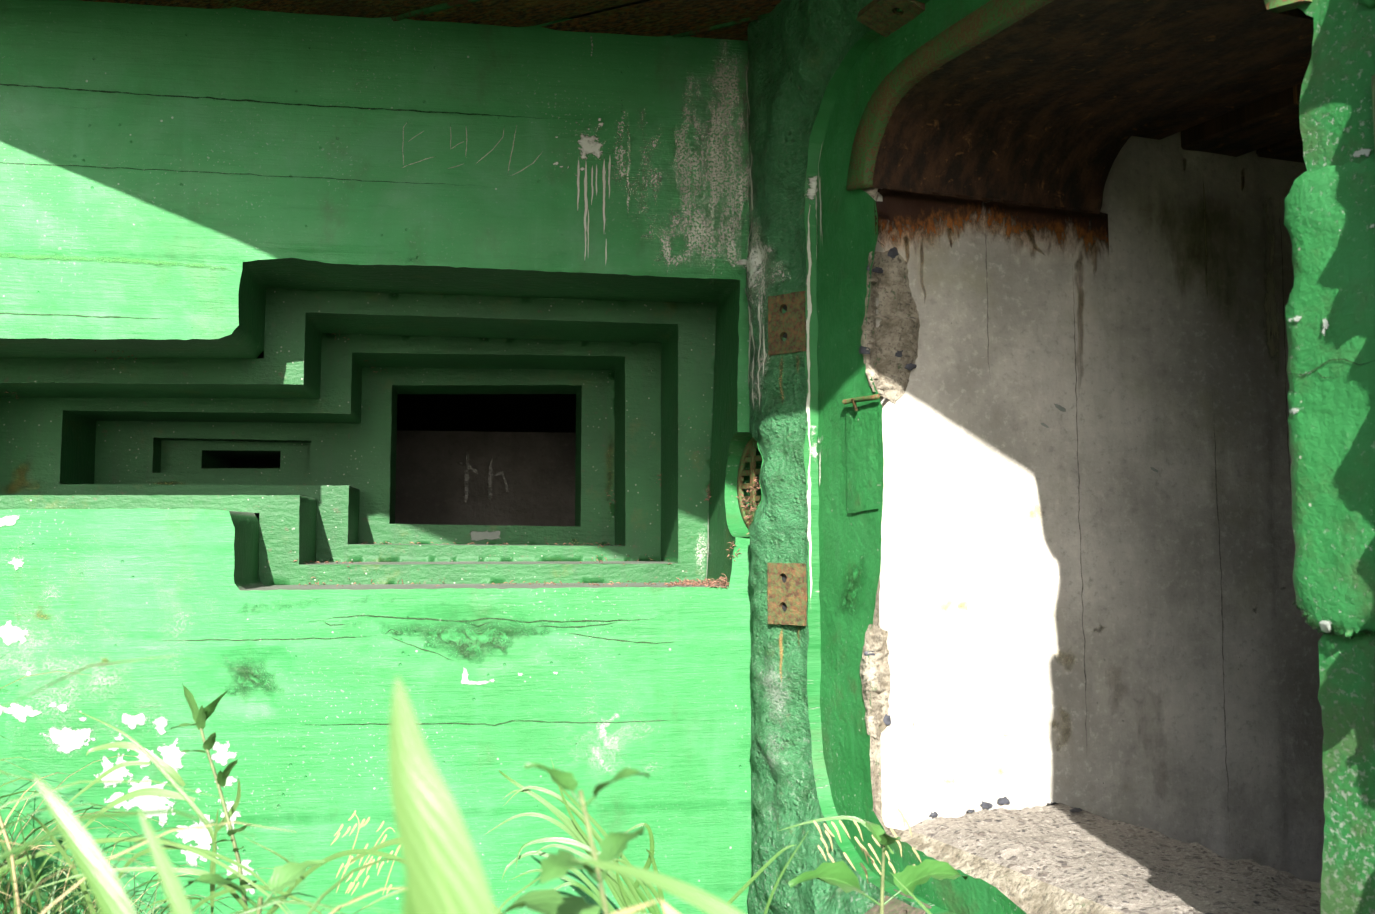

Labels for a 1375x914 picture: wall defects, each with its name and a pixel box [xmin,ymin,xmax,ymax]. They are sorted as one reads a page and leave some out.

leakage [615,111,629,205]
leakage [661,58,784,410]
spalling [861,188,881,201]
corrosion [874,188,1109,268]
spalling [859,243,920,403]
peeling [0,515,19,527]
peeling [0,620,36,645]
spalling [226,662,275,694]
peeling [0,688,257,895]
spalling [860,576,1124,914]